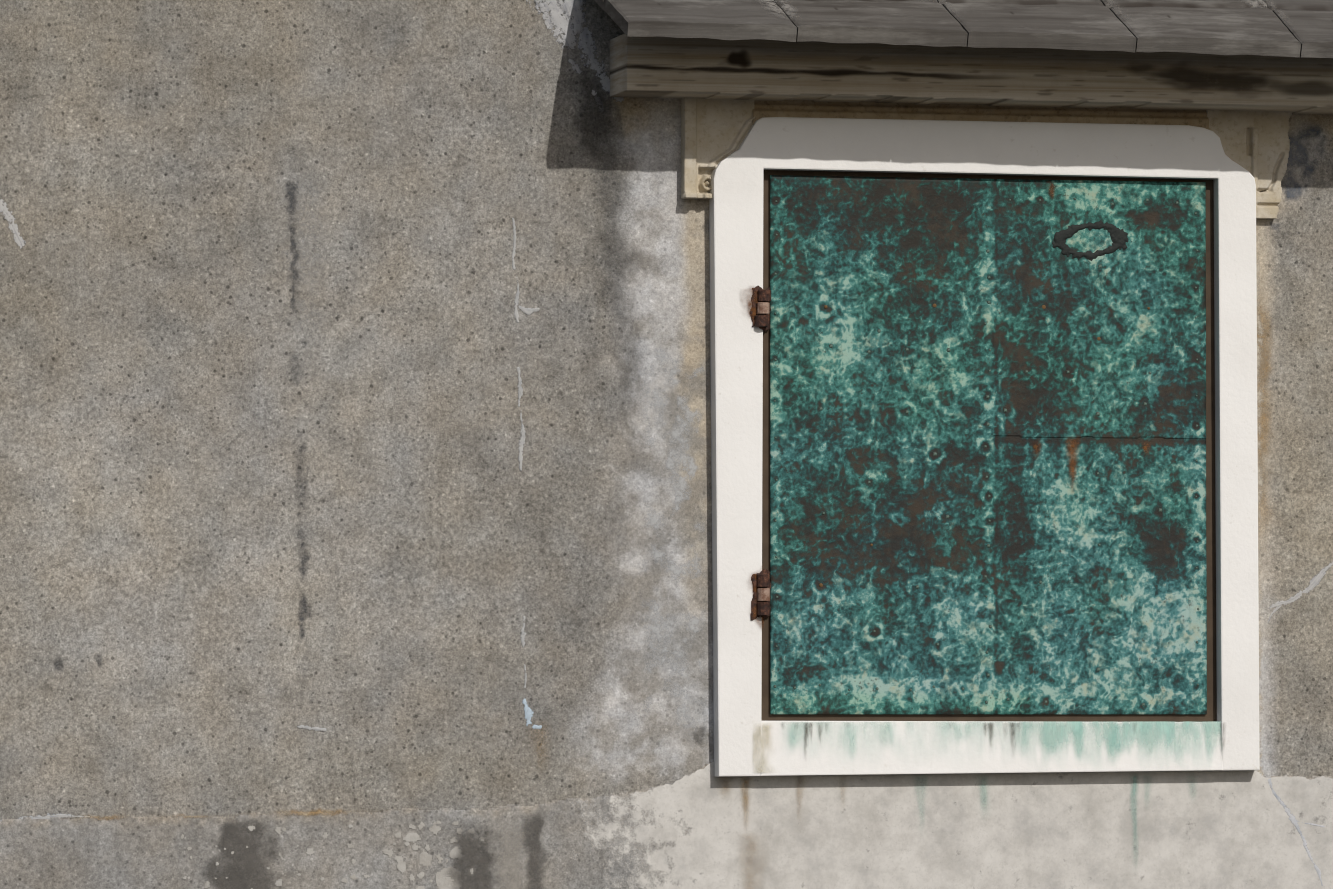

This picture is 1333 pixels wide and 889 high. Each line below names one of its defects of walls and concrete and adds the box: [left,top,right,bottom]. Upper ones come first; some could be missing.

crack [0,199,26,249]
crack [286,184,298,308]
crack [512,218,540,323]
crack [517,367,526,471]
crack [299,542,310,637]
crack [1267,562,1333,623]
crack [519,616,527,688]
leakage [1044,721,1222,753]
crack [0,813,90,821]
leakage [209,823,274,889]
leakage [455,819,543,889]